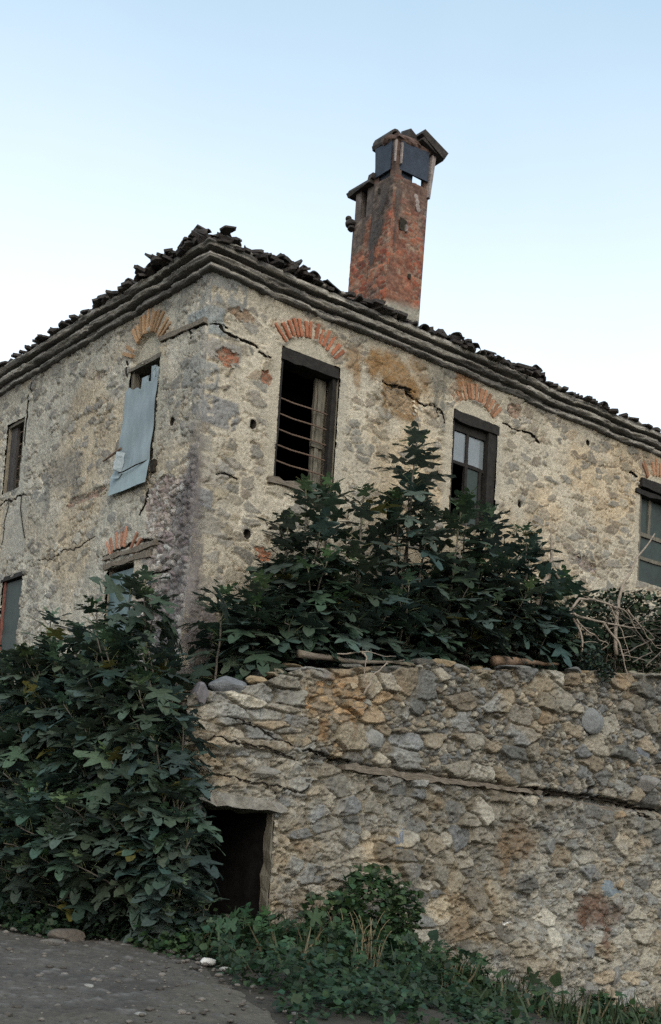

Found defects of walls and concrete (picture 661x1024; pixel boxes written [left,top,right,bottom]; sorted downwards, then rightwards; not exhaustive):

crack [161,323,272,358]
crack [382,381,445,424]
crack [502,423,539,443]
leakage [153,442,215,661]
crack [518,785,657,818]